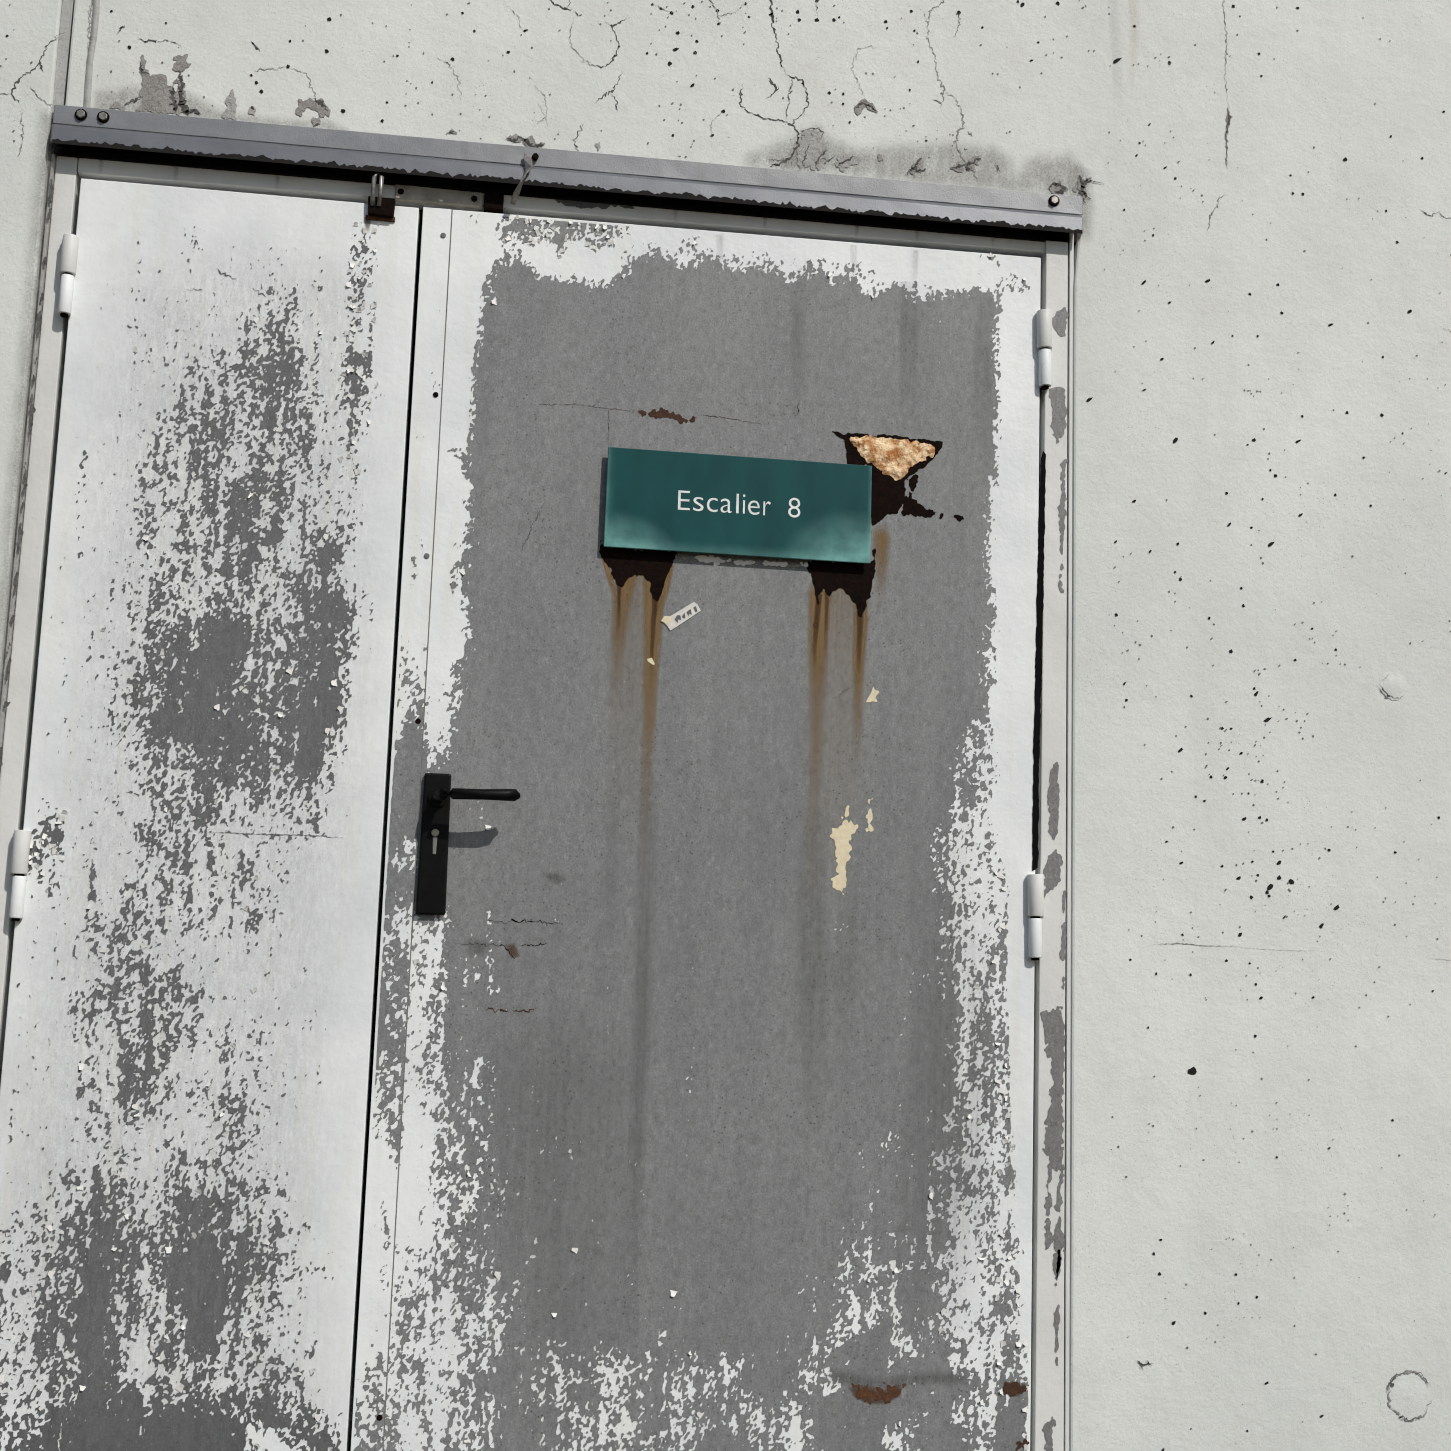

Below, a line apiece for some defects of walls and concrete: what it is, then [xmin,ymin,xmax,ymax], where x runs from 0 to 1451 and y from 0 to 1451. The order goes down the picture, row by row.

spalling [109,10,263,121]
crack [535,0,671,151]
crack [710,0,824,167]
crack [924,0,981,180]
crack [1207,0,1232,231]
peeling [1052,307,1069,337]
rust [599,540,685,728]
rust [807,431,943,700]
peeling [1049,387,1068,593]
peeling [0,199,1056,1451]
spalling [1205,659,1314,832]
spalling [1220,843,1331,919]